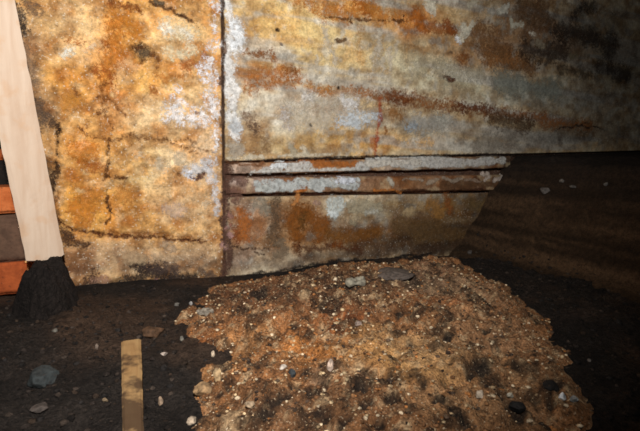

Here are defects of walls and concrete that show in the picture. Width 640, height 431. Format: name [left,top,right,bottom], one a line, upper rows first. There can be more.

corrosion [91,0,143,94]
crack [149,0,193,22]
corrosion [154,51,208,84]
efflorescence [153,1,222,219]
peeling [219,0,506,227]
corrosion [238,47,593,152]
peeling [494,2,545,49]
corrosion [470,20,571,77]
crack [49,122,62,190]
crack [57,83,209,244]
corrosion [230,207,265,244]
corrosion [260,177,499,256]